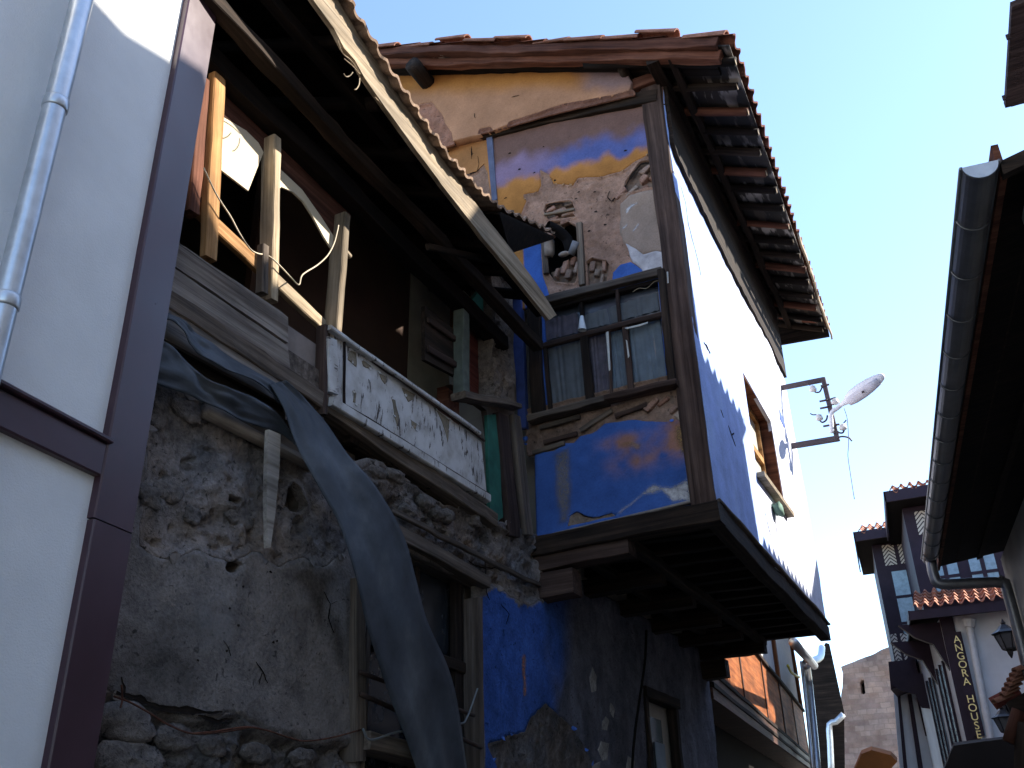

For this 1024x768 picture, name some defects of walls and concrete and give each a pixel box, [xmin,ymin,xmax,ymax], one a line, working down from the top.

spalling [521,154,669,295]
spalling [139,384,347,573]
peeling [391,388,419,431]
spalling [362,460,544,606]
spalling [488,703,615,768]